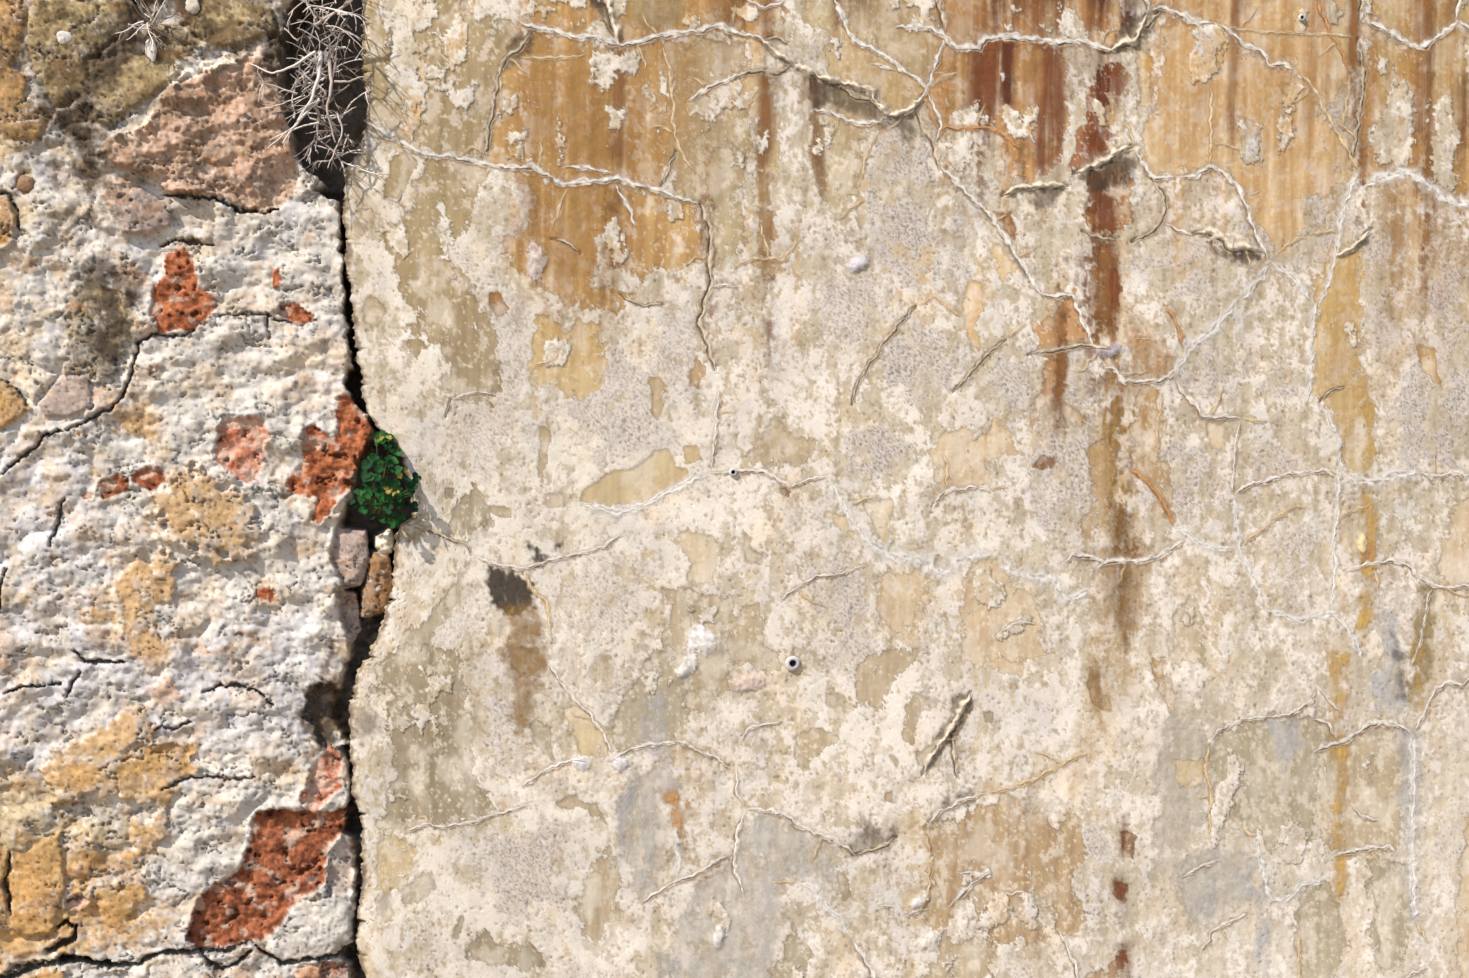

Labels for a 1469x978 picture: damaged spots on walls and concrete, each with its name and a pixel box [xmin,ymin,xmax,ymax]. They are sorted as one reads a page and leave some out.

corrosion [758,75,772,175]
corrosion [971,40,1014,178]
spalling [150,250,218,336]
peeling [286,0,1469,525]
corrosion [1082,50,1125,449]
crack [0,311,317,476]
crack [366,0,1469,978]
crack [7,650,126,698]
peeling [186,497,496,956]
water stain [485,543,561,726]
peeling [1120,595,1418,978]
crack [0,919,351,978]